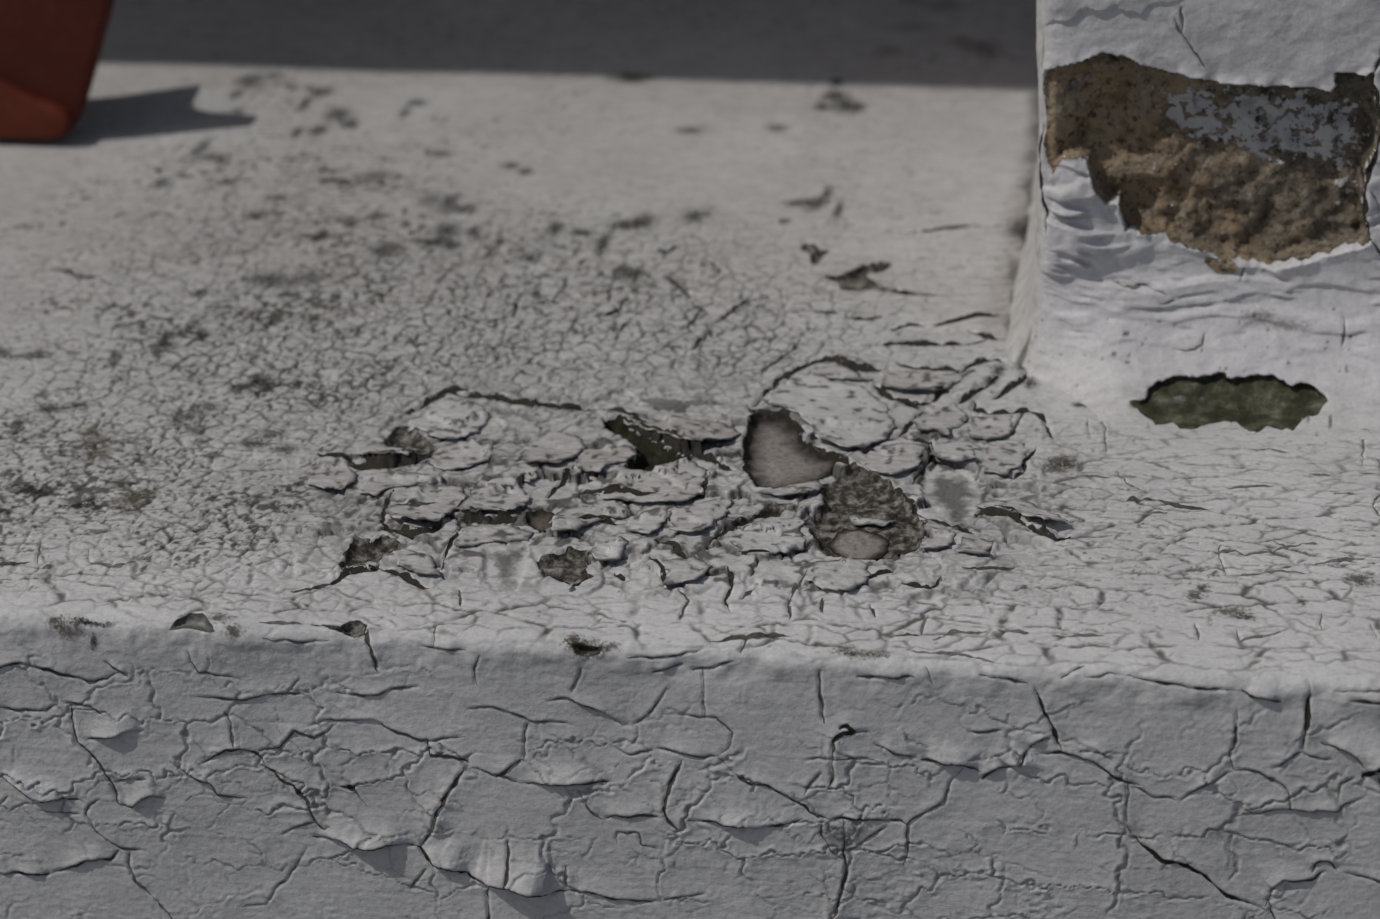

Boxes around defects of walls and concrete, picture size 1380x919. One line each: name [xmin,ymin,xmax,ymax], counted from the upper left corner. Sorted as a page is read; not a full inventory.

spalling [1043,52,1380,273]
crack [908,225,1001,233]
crack [56,268,98,278]
crack [482,300,561,322]
crack [603,297,633,331]
crack [658,244,754,350]
crack [1112,280,1174,305]
spalling [1129,373,1328,433]
peeling [306,364,1068,591]
crack [0,310,1380,919]